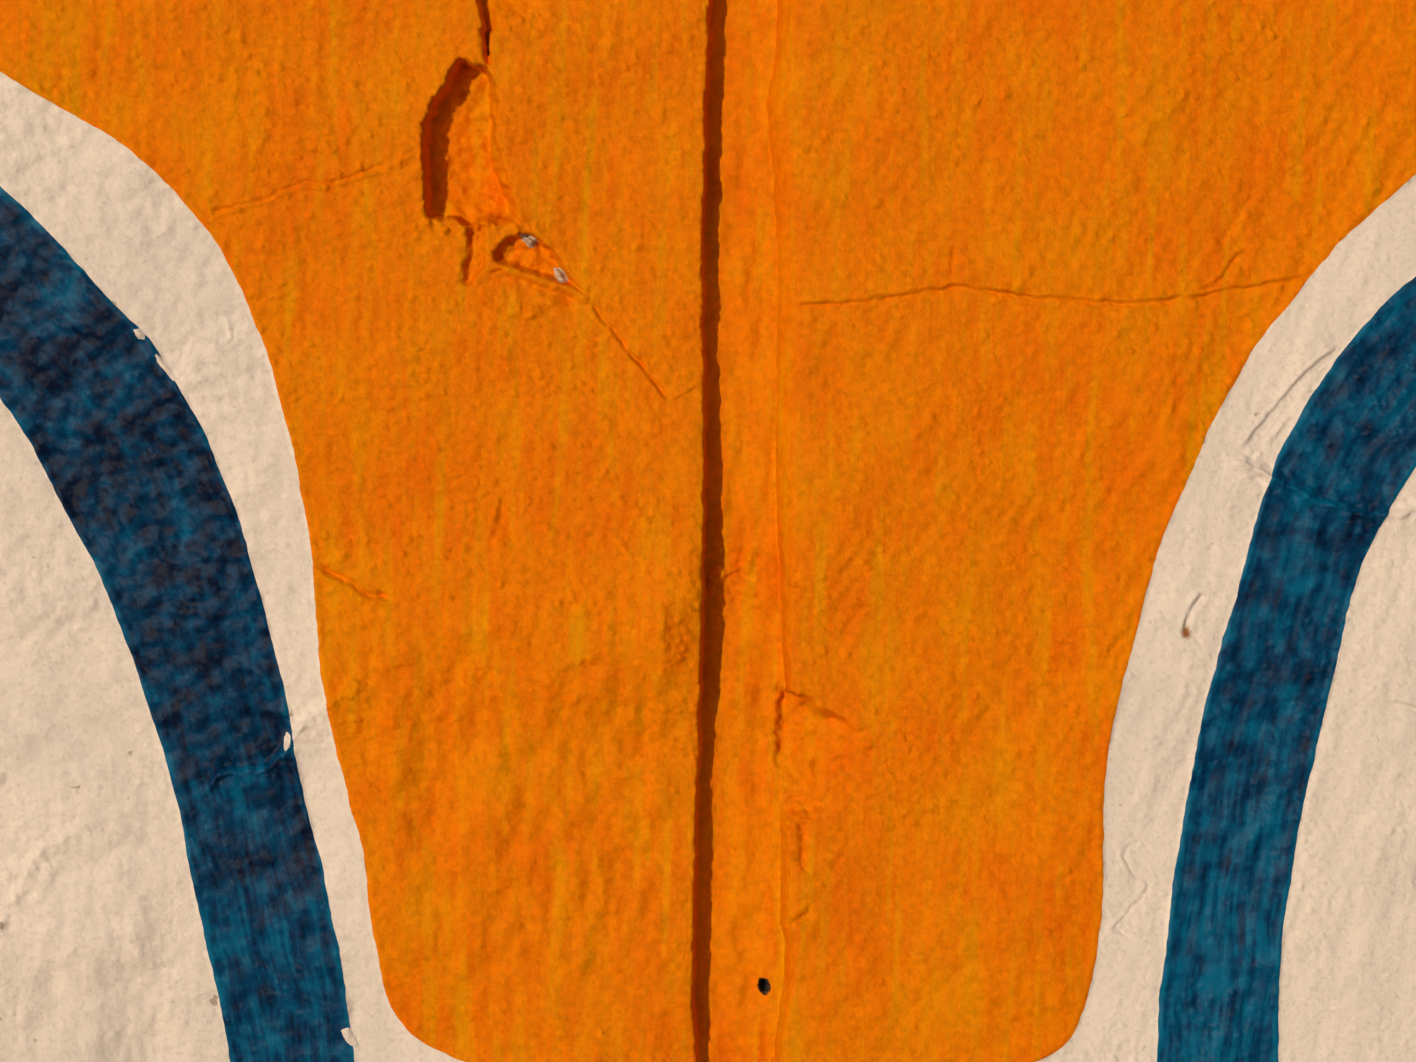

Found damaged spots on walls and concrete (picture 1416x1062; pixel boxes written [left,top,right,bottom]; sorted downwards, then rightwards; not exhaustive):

spalling [420,0,591,323]
crack [784,241,1319,313]
crack [1215,452,1416,525]
crack [198,669,358,799]